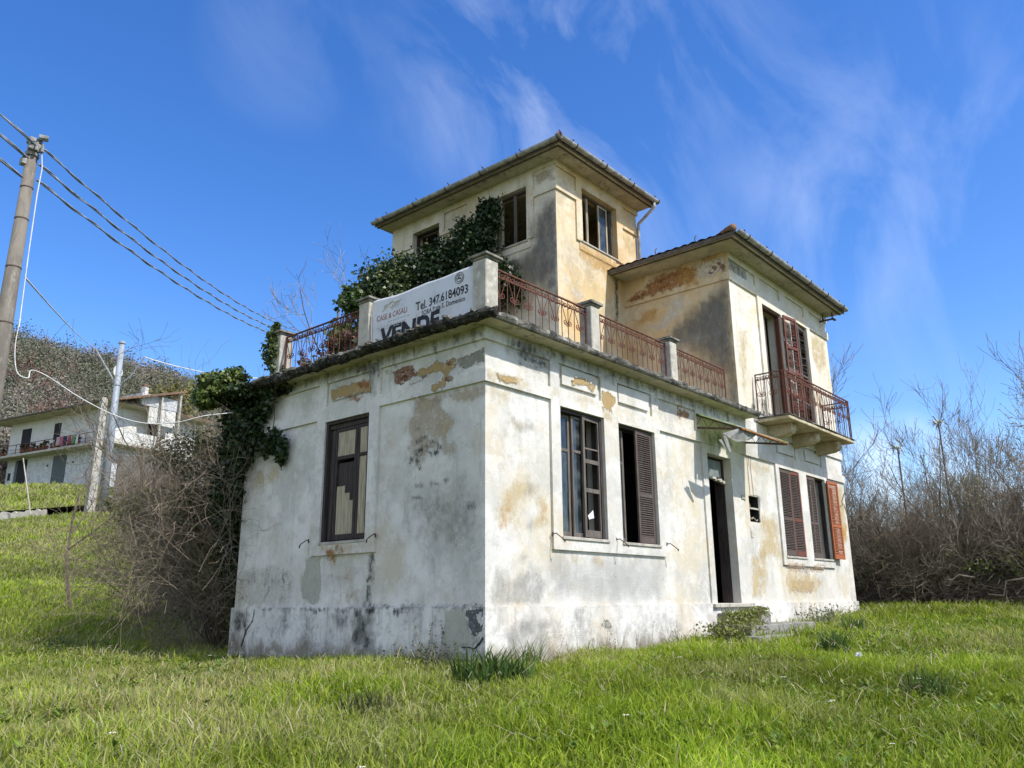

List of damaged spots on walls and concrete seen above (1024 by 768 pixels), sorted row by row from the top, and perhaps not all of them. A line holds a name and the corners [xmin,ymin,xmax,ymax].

water stain [506,202,556,288]
flaking render [630,256,727,301]
water stain [673,289,744,377]
flaking render [330,379,371,401]
flaking render [385,348,485,468]
peeling [497,372,517,384]
flaking render [571,376,616,412]
water stain [338,554,407,647]
flaking render [465,607,483,637]